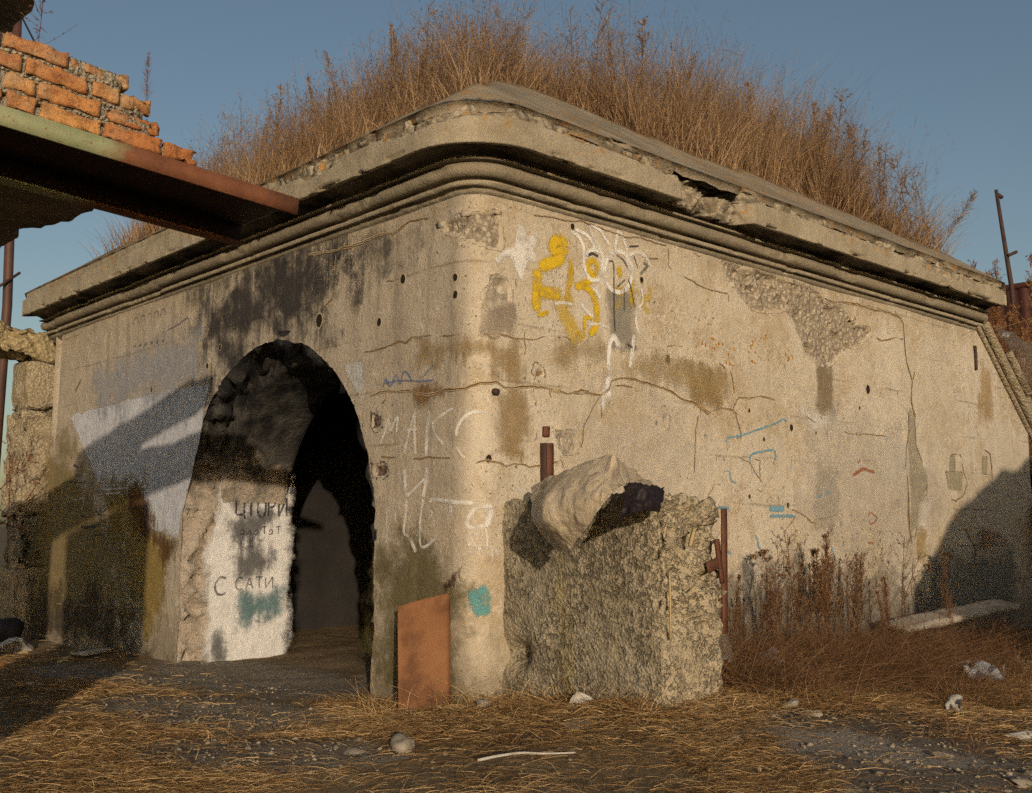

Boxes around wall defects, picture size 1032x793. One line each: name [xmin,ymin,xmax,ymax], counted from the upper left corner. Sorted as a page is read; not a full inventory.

spalling [436,208,506,252]
spalling [722,260,872,368]
leakage [455,341,529,456]
crack [370,363,775,497]
leakage [627,356,727,407]
leakage [800,366,837,433]
crack [826,298,1008,606]
leakage [26,432,169,657]